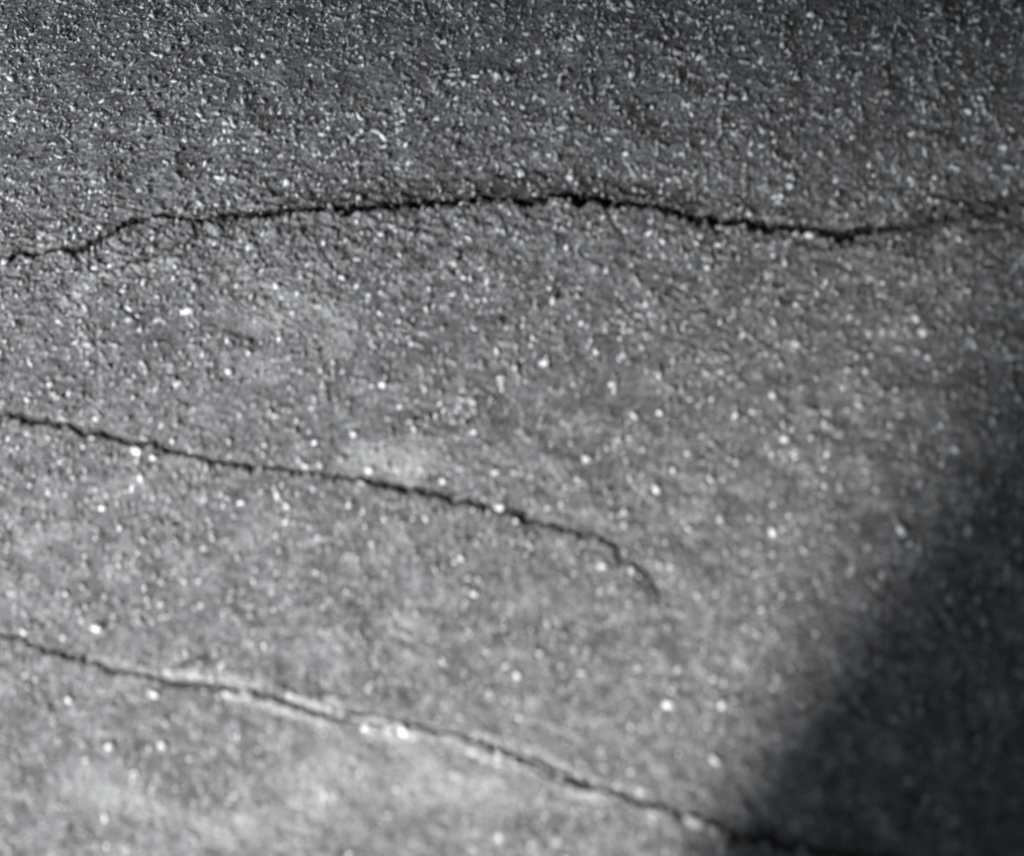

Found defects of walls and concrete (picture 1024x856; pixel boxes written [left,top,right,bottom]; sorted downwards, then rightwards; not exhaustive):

crack [0,188,1024,272]
crack [0,410,659,597]
crack [0,634,914,856]